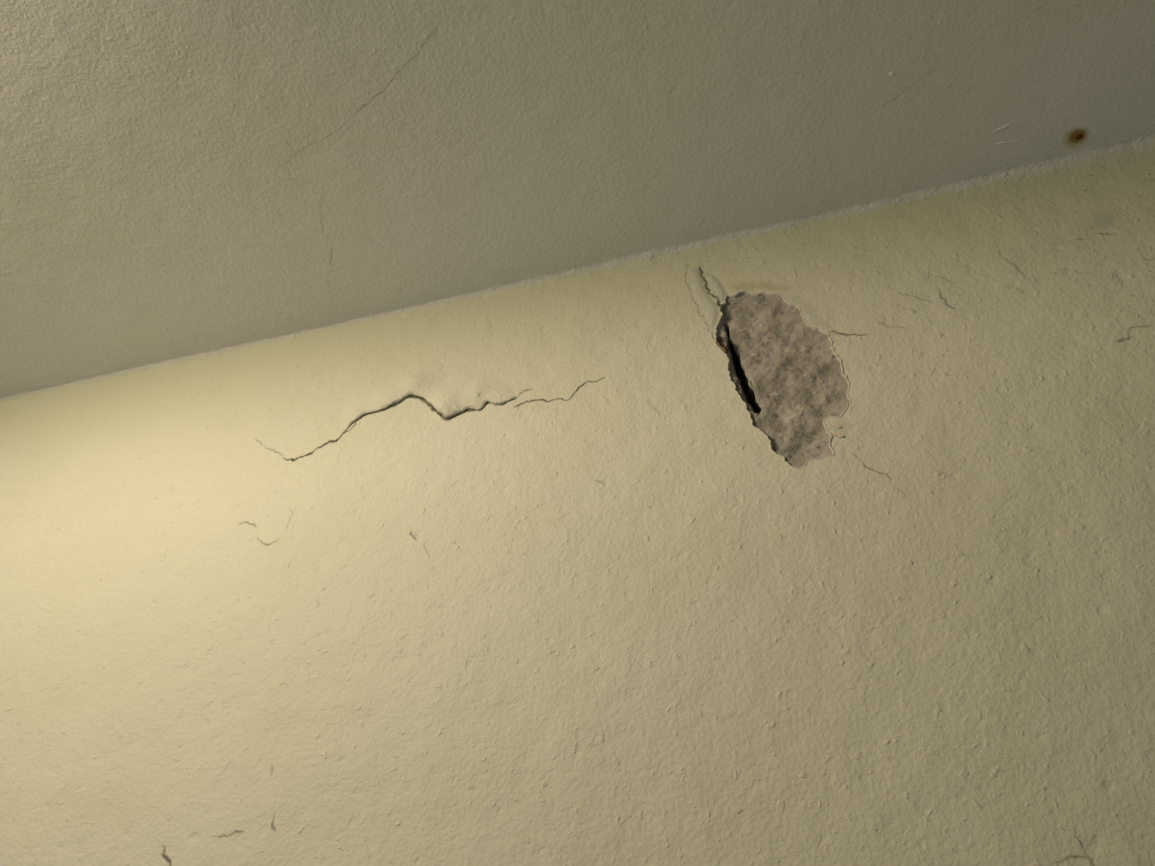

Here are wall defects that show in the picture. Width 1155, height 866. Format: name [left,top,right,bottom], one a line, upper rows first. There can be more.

corrosion [1066,130,1085,145]
spalling [689,268,852,469]
crack [287,378,602,461]